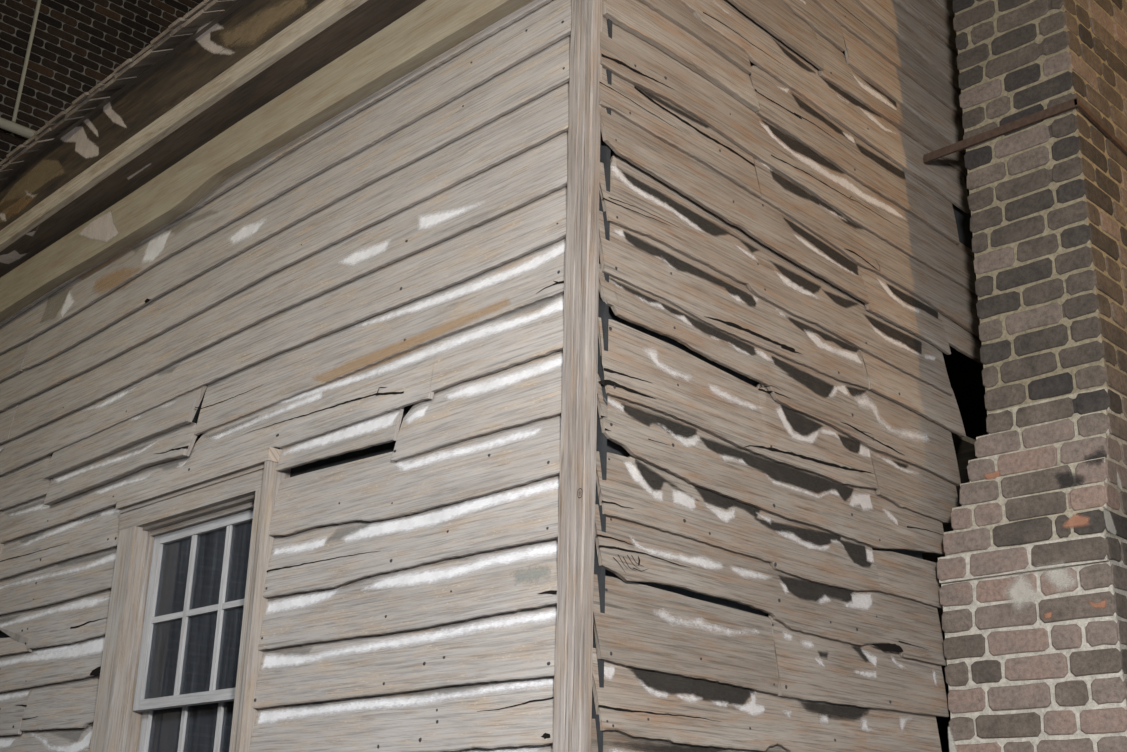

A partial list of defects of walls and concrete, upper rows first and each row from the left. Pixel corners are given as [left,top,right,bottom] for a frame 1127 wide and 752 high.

peeling [196,0,306,54]
peeling [103,100,126,128]
peeling [60,119,99,158]
peeling [0,160,65,223]
peeling [79,211,119,242]
peeling [0,250,25,264]
crack [704,316,803,355]
crack [758,385,790,399]
crack [247,387,404,433]
crack [841,422,903,455]
crack [738,445,874,474]